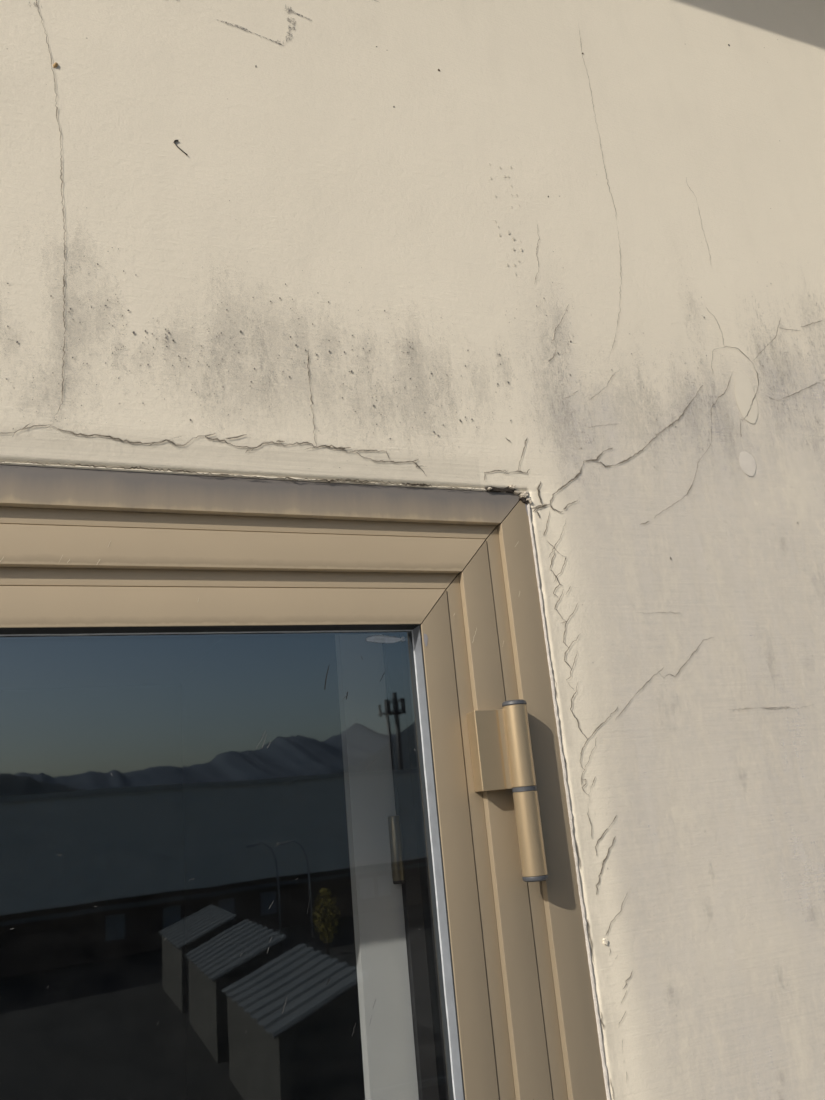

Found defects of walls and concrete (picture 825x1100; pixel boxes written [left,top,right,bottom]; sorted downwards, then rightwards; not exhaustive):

crack [36,0,64,221]
water stain [55,294,255,399]
crack [2,244,820,895]